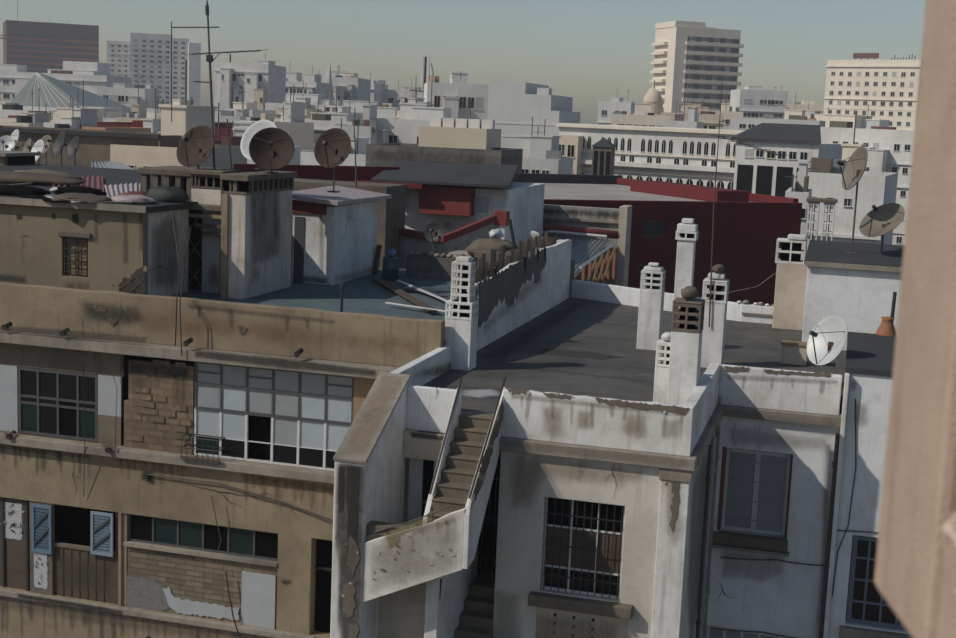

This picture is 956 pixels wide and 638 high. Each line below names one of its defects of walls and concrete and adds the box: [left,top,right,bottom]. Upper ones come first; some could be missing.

spalling [112,265,147,294]
peeling [476,246,547,328]
leakage [86,304,138,322]
peeling [595,398,689,415]
spalling [663,480,680,532]